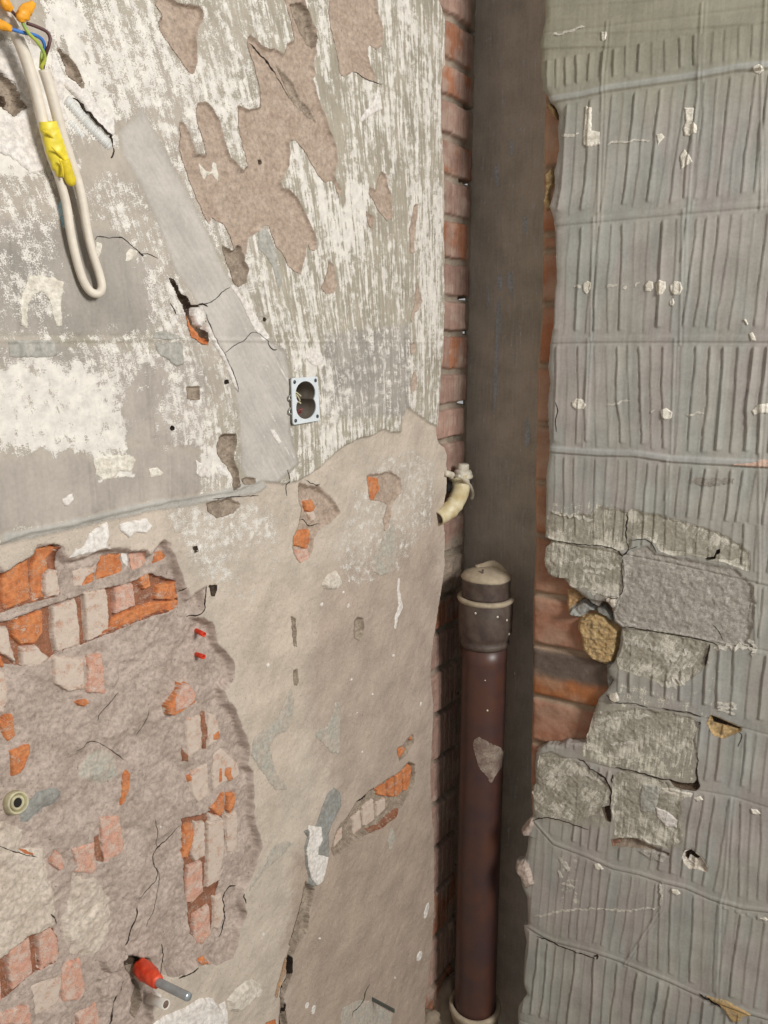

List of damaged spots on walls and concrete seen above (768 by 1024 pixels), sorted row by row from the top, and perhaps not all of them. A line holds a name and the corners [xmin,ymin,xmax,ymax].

spalling [155,0,204,74]
spalling [328,0,384,82]
spalling [178,0,342,341]
crack [95,236,157,258]
crack [170,287,277,390]
spalling [206,433,256,518]
spalling [292,482,341,563]
peeling [545,504,756,686]
spalling [0,540,263,1024]
peeling [532,708,742,872]
crack [125,819,199,979]
crack [219,885,246,936]